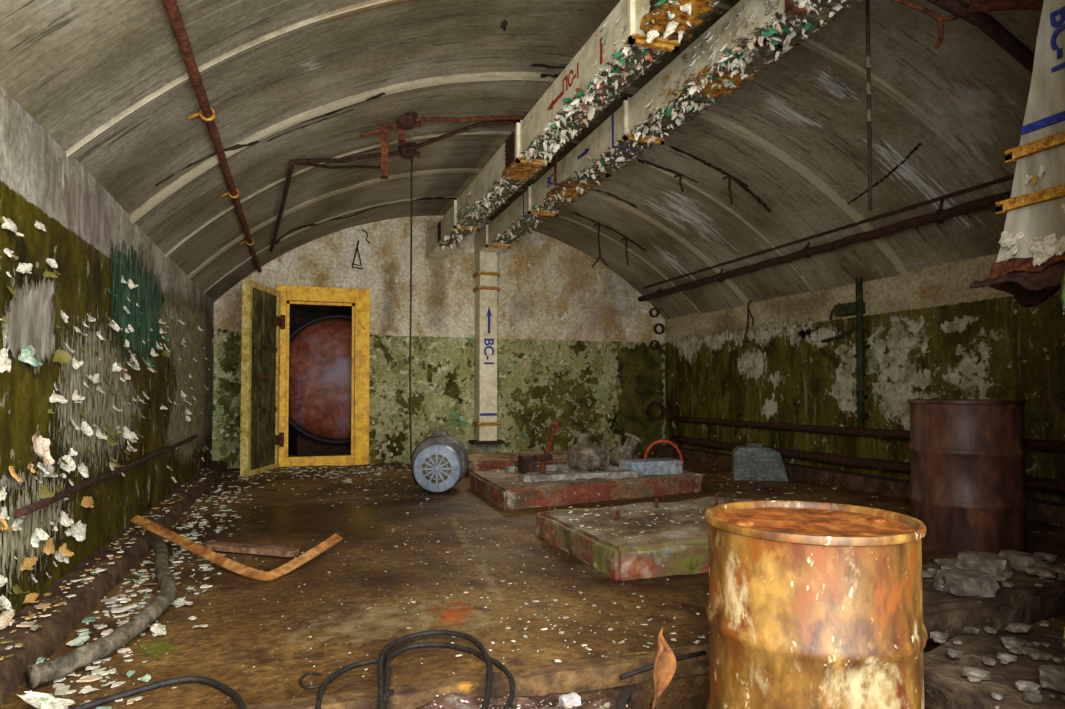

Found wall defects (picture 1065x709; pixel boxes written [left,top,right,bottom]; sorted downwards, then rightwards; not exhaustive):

peeling [490,0,846,245]
peeling [0,215,24,237]
peeling [436,178,521,250]
peeling [998,230,1065,267]
peeling [501,308,1000,455]
peeling [0,232,242,629]
peeling [66,631,91,646]